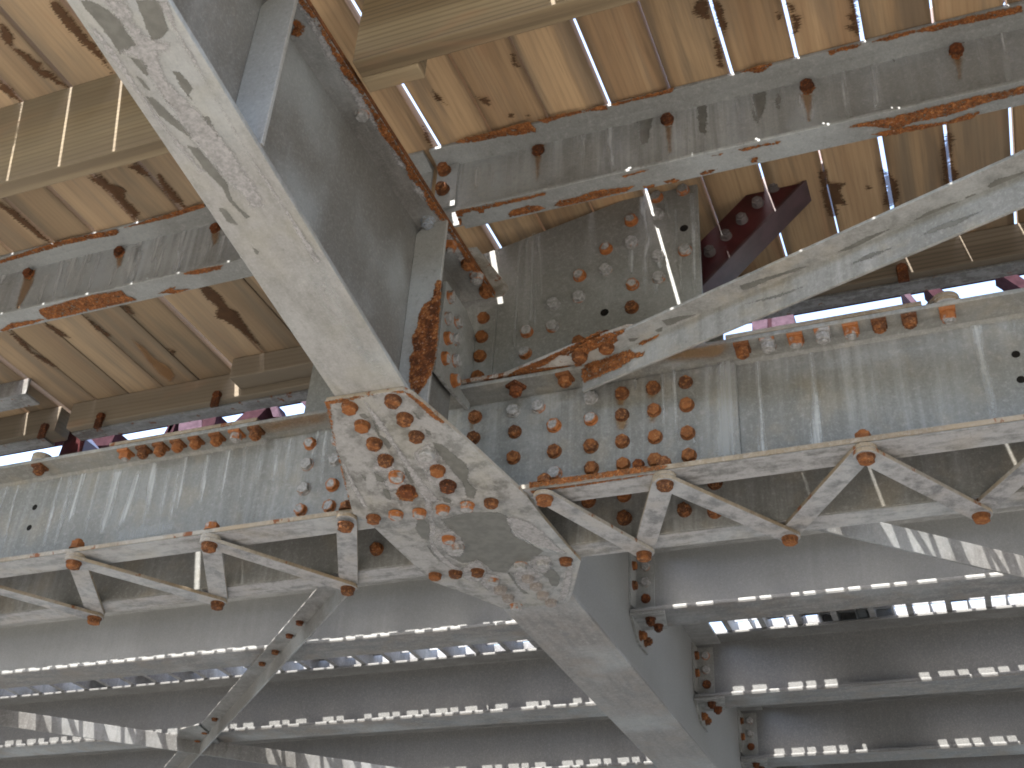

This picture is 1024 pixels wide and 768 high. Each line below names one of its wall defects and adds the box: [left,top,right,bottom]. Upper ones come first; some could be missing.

corrosion [828,6,1023,55]
corrosion [740,63,773,73]
corrosion [850,86,1024,137]
corrosion [291,0,680,298]
corrosion [738,141,781,163]
corrosion [0,204,205,263]
corrosion [184,265,223,275]
corrosion [0,290,136,331]
corrosion [392,280,444,423]
corrosion [507,329,659,383]
corrosion [325,394,378,497]
corrosion [529,465,667,493]